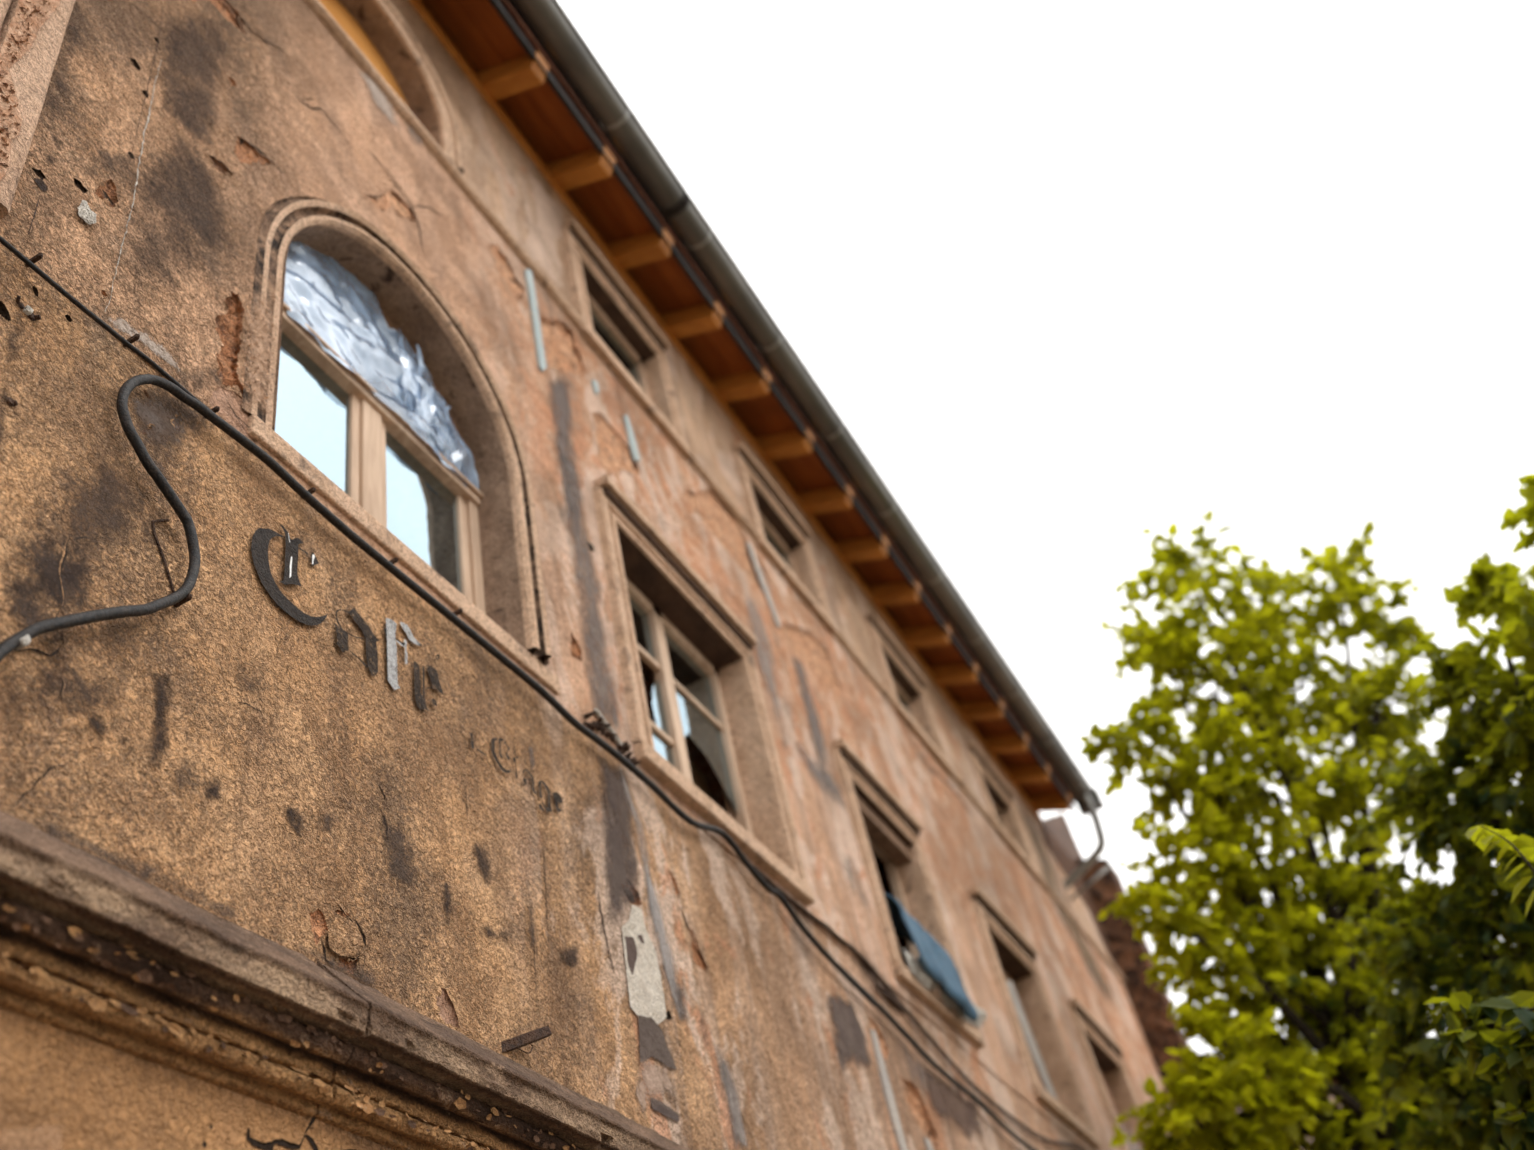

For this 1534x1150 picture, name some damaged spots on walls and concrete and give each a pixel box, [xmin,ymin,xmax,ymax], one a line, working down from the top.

peeling [0,0,60,180]
spalling [73,177,121,208]
spalling [204,291,276,443]
peeling [0,891,351,1053]
peeling [0,950,499,1150]
crack [247,1116,363,1150]
crack [321,902,371,974]
peeling [363,1049,575,1150]
damp [599,758,686,1019]
peeling [622,894,672,1024]
spalling [684,922,708,972]
damp [829,996,871,1068]